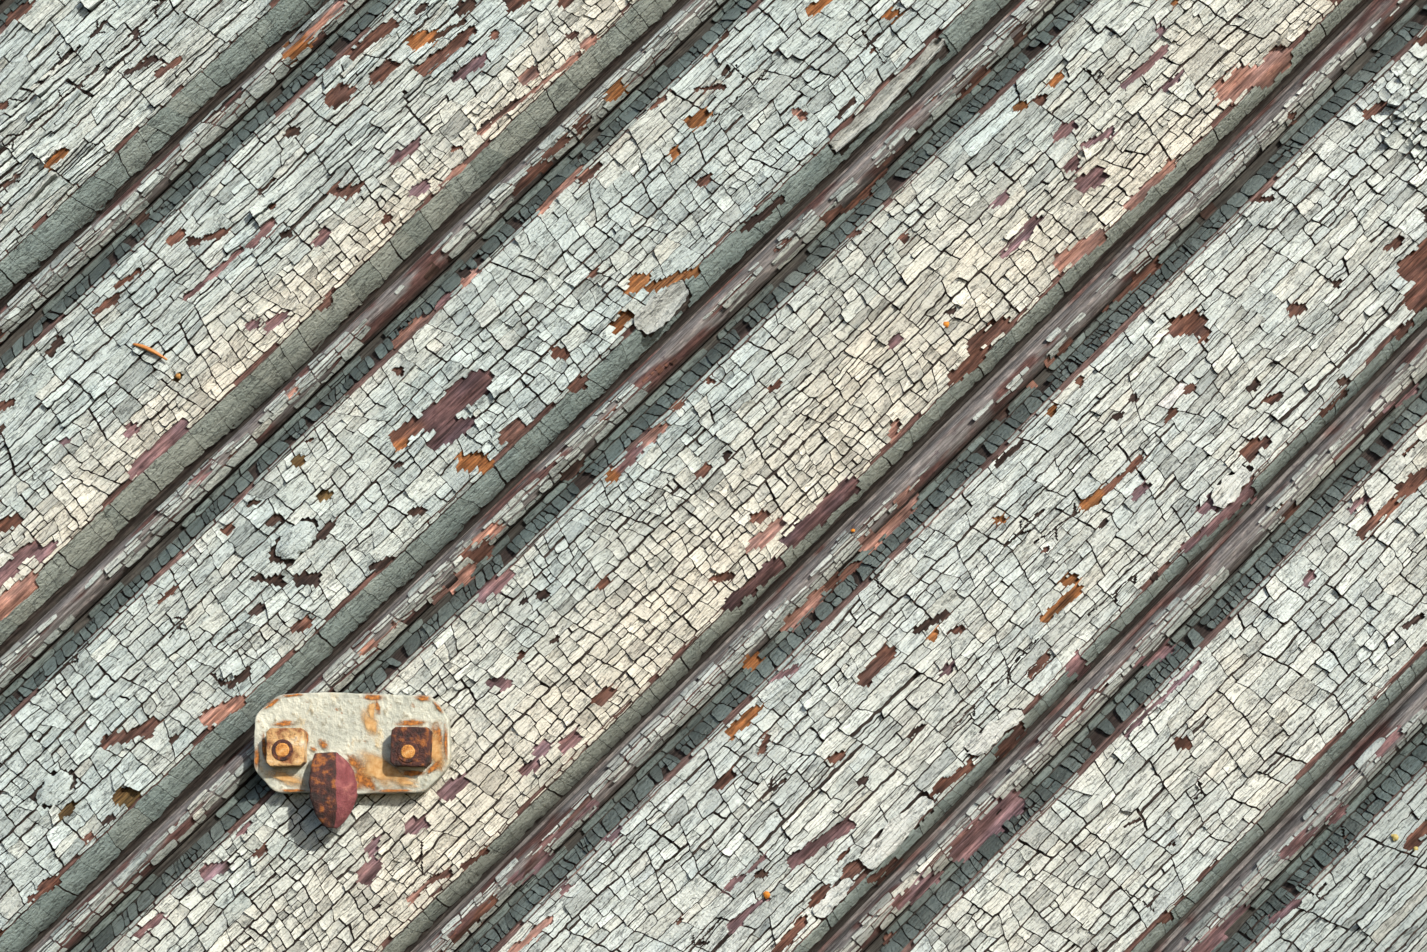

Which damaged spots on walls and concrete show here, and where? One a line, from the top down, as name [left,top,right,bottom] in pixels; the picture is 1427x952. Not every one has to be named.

crack [0,0,171,193]
peeling [1370,198,1427,343]
peeling [1144,297,1224,351]
peeling [380,353,531,477]
crack [1001,499,1080,552]
peeling [844,608,969,688]
crack [953,638,1043,730]
peeling [58,707,181,846]
corrosion [255,720,292,766]
corrosion [273,772,305,792]
corrosion [348,695,448,792]
crack [686,916,726,952]